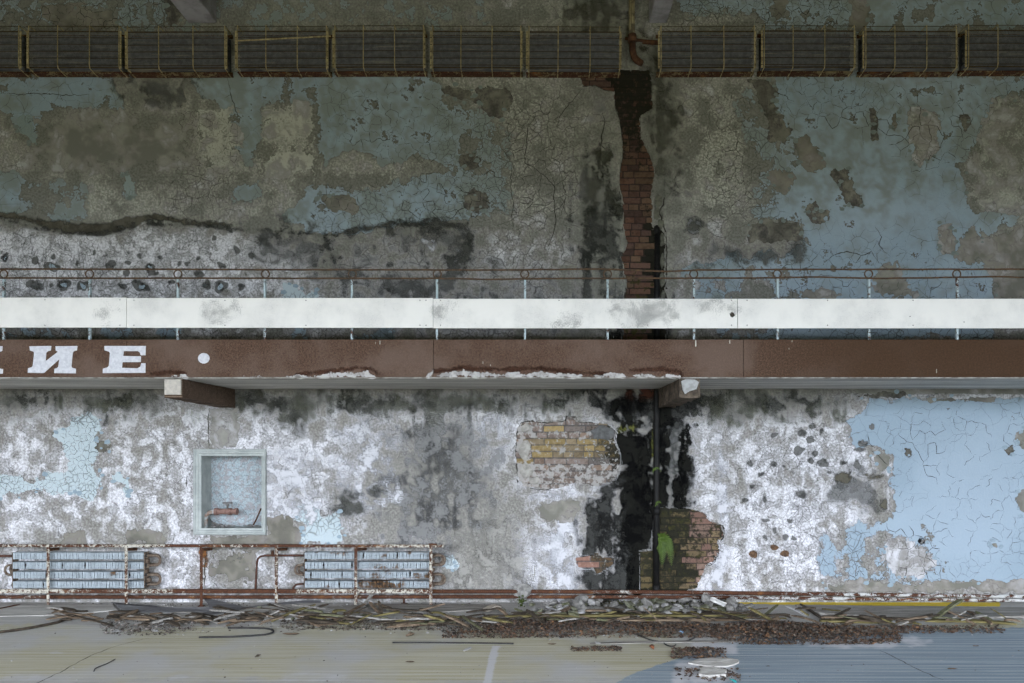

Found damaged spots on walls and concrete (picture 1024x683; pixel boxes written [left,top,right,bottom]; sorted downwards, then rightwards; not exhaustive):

crack [0,81,313,298]
crack [311,82,582,254]
water stain [566,143,628,299]
flaking render [581,69,668,299]
crack [700,78,1014,228]
water stain [150,370,188,379]
water stain [609,328,625,340]
flaking render [623,328,666,340]
water stain [235,365,859,602]
flaking render [515,415,620,524]
flaking render [640,507,725,591]
crack [726,409,1024,585]